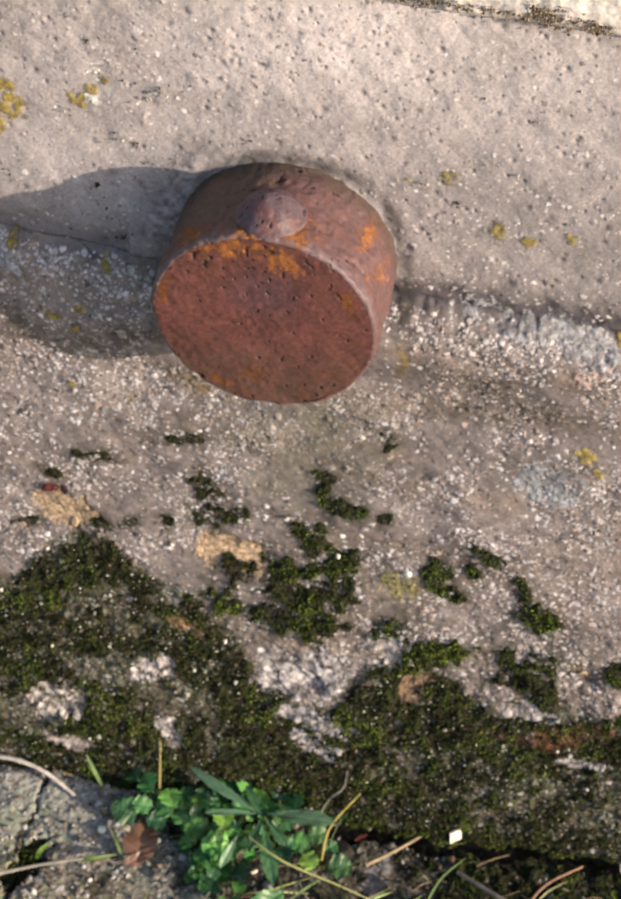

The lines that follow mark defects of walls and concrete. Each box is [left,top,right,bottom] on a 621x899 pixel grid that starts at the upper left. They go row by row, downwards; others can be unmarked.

rust [221,230,298,272]
crack [17,776,49,840]